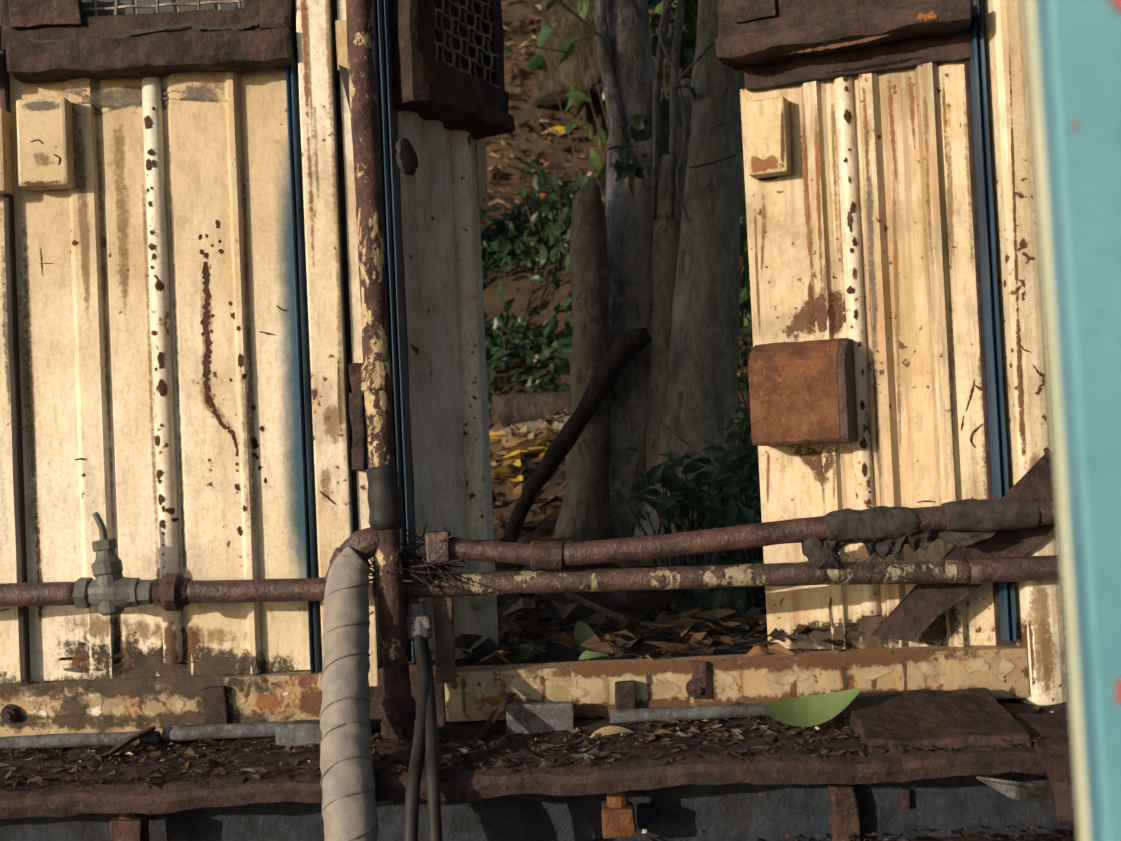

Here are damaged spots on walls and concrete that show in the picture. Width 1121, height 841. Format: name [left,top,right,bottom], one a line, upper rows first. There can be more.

rust [751,109,784,181]
rust [782,106,846,341]
rust [754,197,766,328]
leakage [1,254,11,403]
rust [20,265,43,582]
rust [229,353,267,483]
rust [792,445,838,499]
peeling [504,676,588,701]
peeling [647,678,681,701]
peeling [712,672,735,695]
peeling [765,668,809,685]
peeling [848,662,893,680]